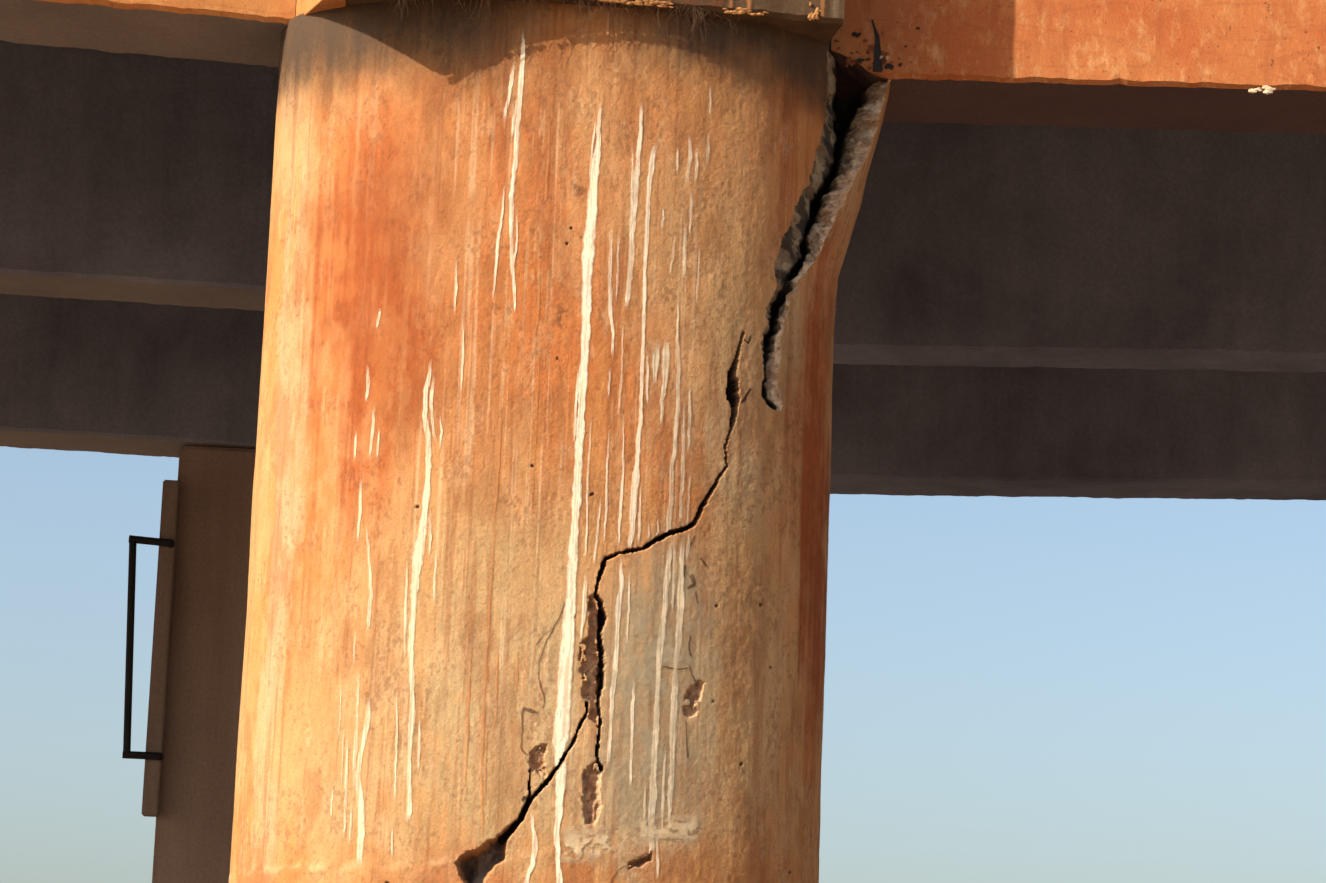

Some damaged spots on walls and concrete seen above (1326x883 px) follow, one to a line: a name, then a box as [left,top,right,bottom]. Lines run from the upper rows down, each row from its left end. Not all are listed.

rust [598,0,674,8]
rust [718,0,769,16]
rust [808,0,823,21]
crack [872,20,883,72]
efflorescence [494,38,525,309]
water stain [553,111,697,883]
crack [497,48,849,845]
efflorescence [394,368,443,818]
spalling [578,594,599,727]
efflorescence [331,689,370,859]
spalling [455,825,512,883]
spalling [564,761,611,860]